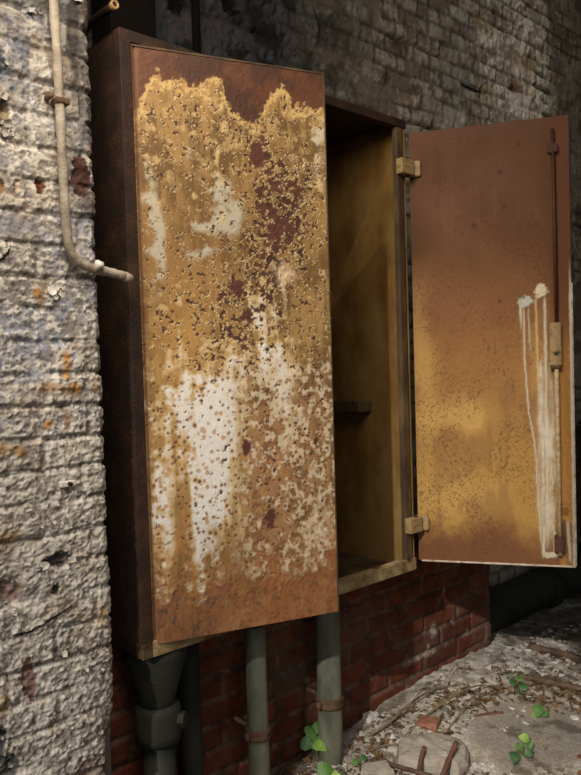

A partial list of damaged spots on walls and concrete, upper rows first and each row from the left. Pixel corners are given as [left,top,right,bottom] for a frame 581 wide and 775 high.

spalling [0,729,20,775]